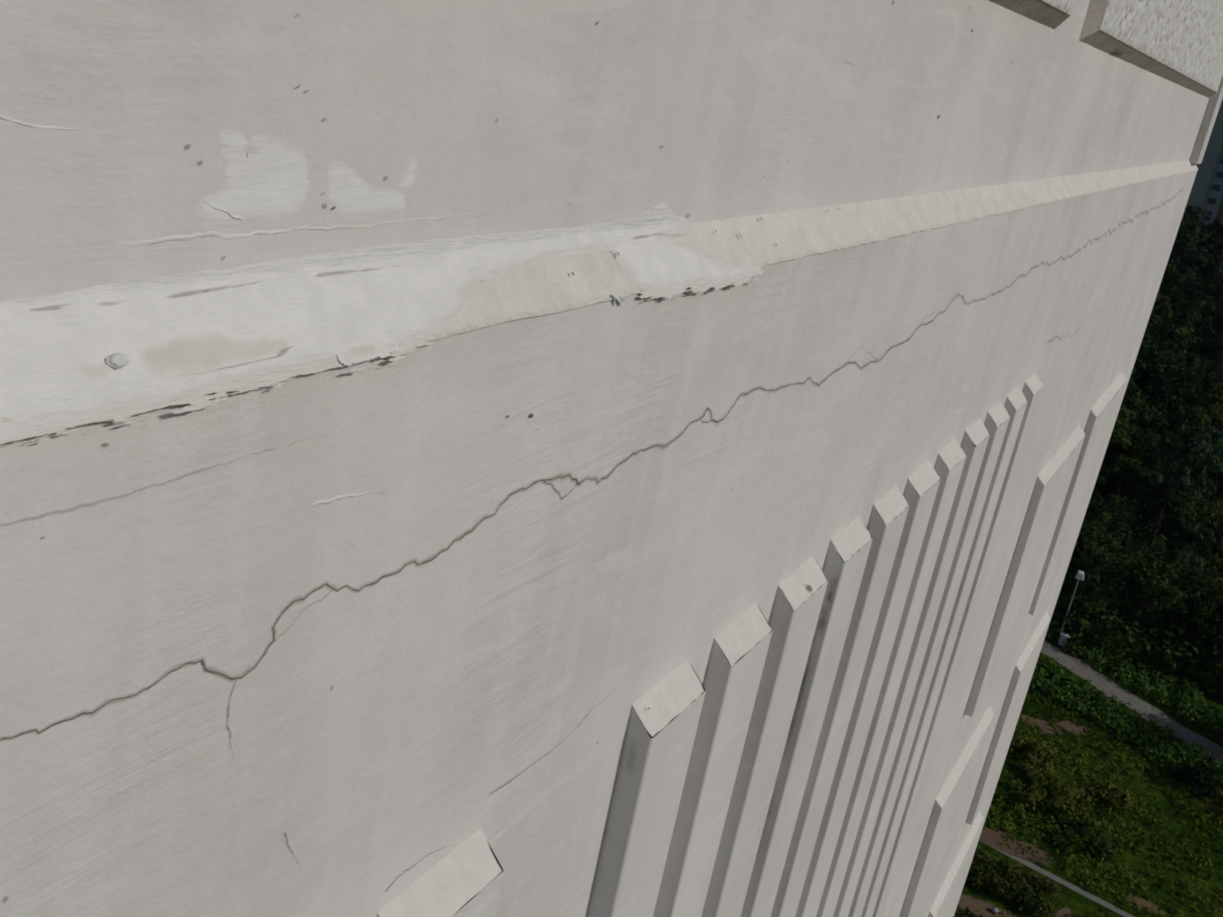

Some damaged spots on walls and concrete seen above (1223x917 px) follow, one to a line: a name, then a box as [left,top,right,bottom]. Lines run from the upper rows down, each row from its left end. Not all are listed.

peeling [138,332,290,380]
peeling [336,339,399,366]
crack [1,297,963,744]